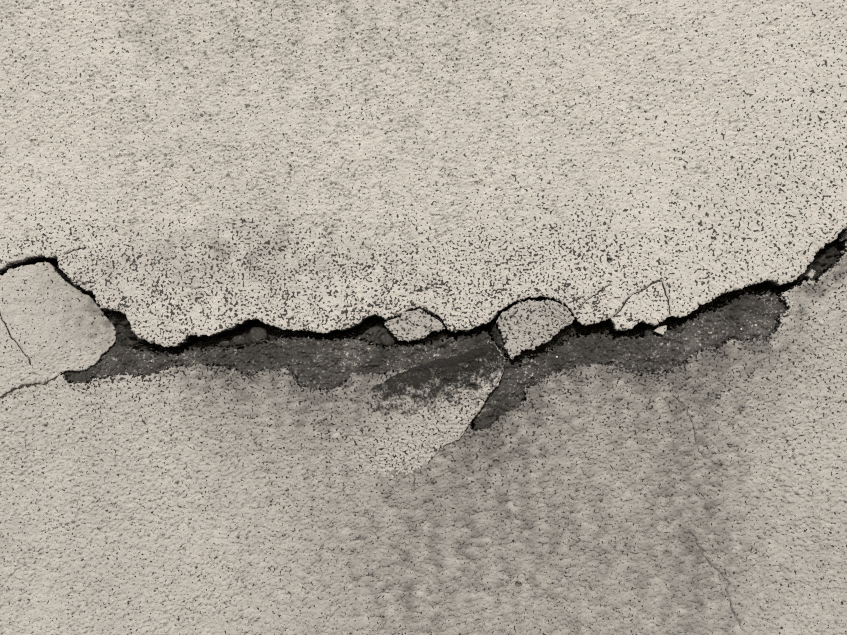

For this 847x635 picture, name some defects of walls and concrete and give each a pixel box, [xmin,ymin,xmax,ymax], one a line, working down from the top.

crack [0,313,31,365]
spalling [62,290,788,478]
crack [47,230,844,367]